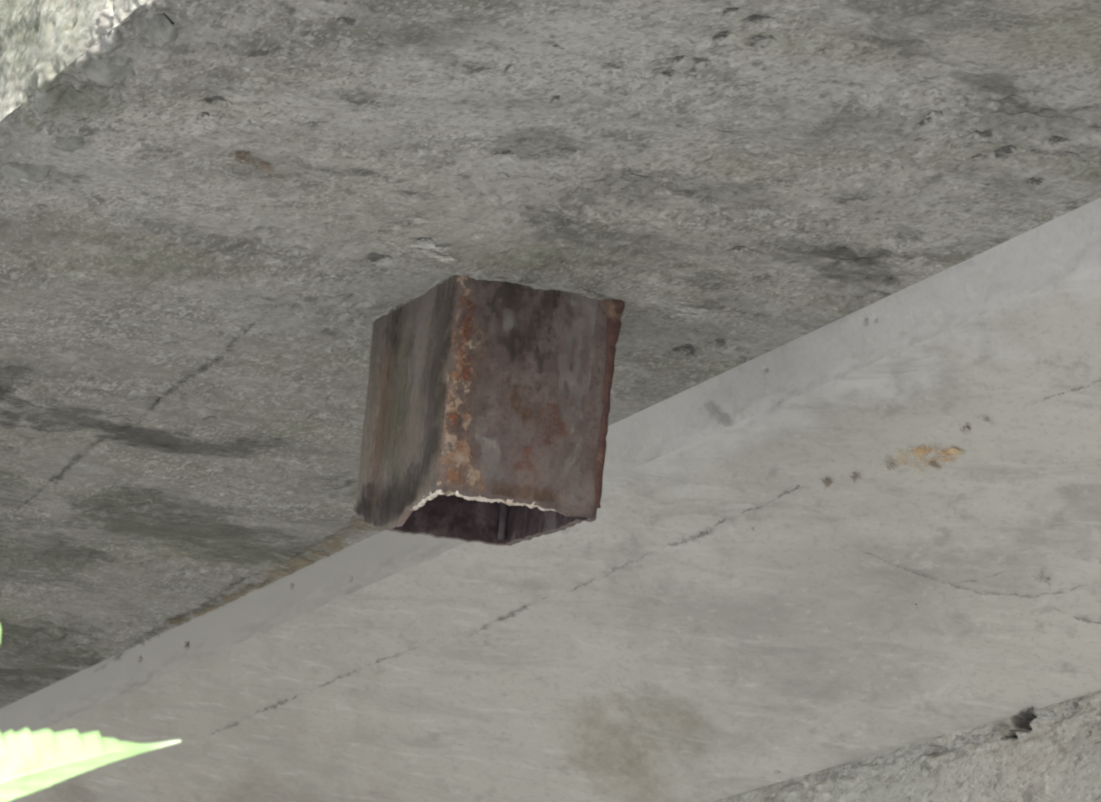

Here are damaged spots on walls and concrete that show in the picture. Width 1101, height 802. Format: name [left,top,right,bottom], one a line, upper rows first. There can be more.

leakage [0,366,281,458]
rust [436,275,485,491]
leakage [76,487,310,564]
rust [166,463,419,626]
spalling [970,707,1037,744]